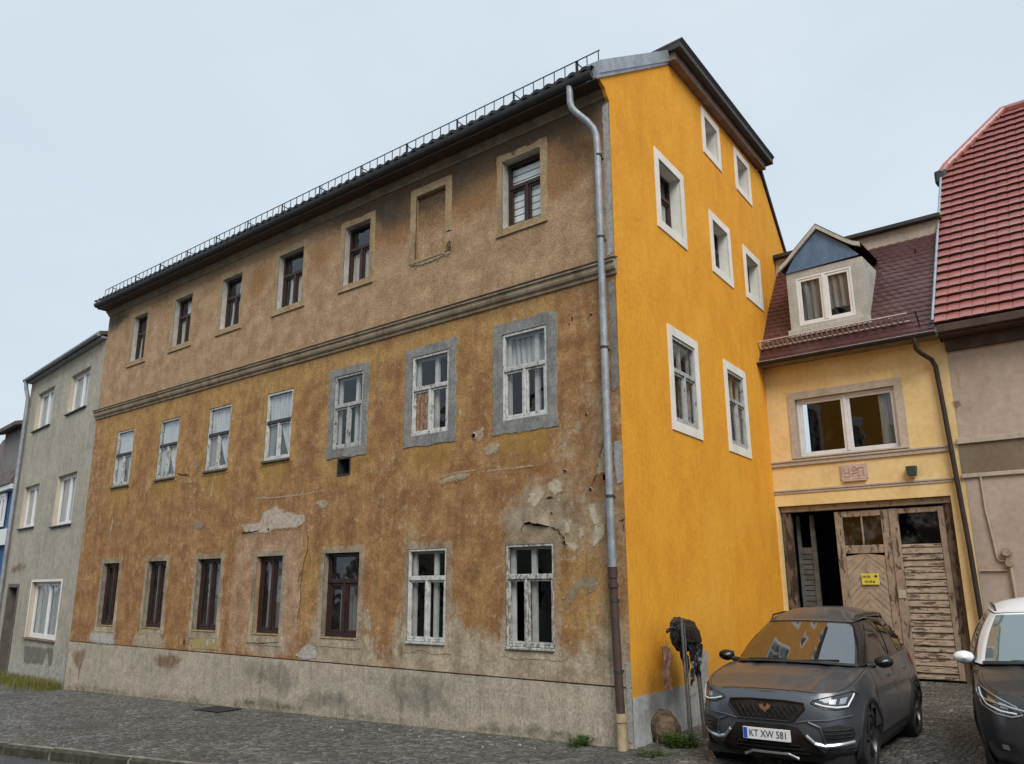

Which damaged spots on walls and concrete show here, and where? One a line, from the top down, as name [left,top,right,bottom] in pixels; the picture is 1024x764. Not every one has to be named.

flaking render [528,469,567,507]
flaking render [243,507,306,534]
flaking render [563,505,604,551]
flaking render [296,644,316,659]